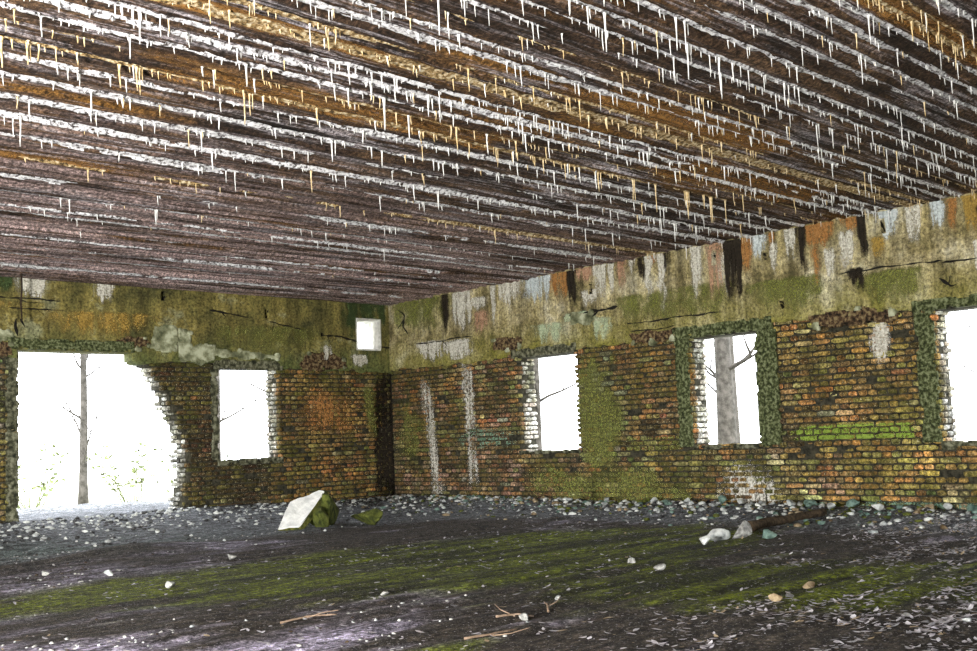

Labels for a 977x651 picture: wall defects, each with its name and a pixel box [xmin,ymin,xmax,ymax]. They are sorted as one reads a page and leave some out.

rust [853,0,977,66]